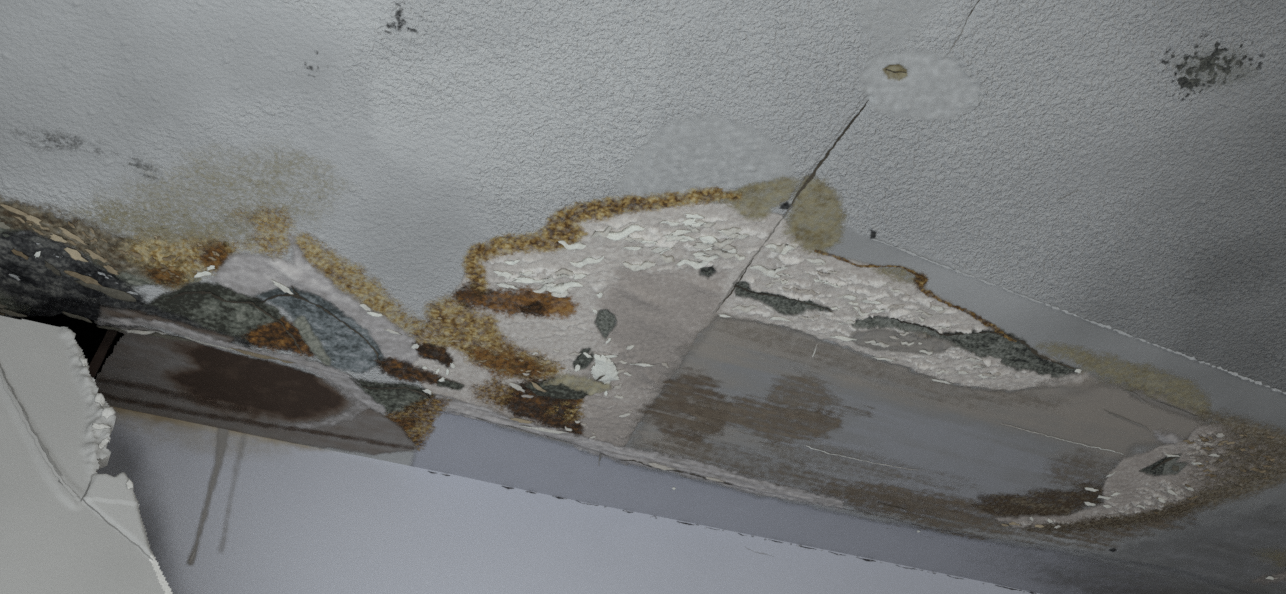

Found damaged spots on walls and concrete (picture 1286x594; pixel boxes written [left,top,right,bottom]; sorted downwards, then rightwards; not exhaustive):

mould [1162,36,1262,100]
crack [713,100,869,313]
crack [58,473,153,560]
leakage [0,157,1017,565]
peeling [0,202,1103,447]
leakage [631,316,1286,548]
peeling [996,424,1286,530]